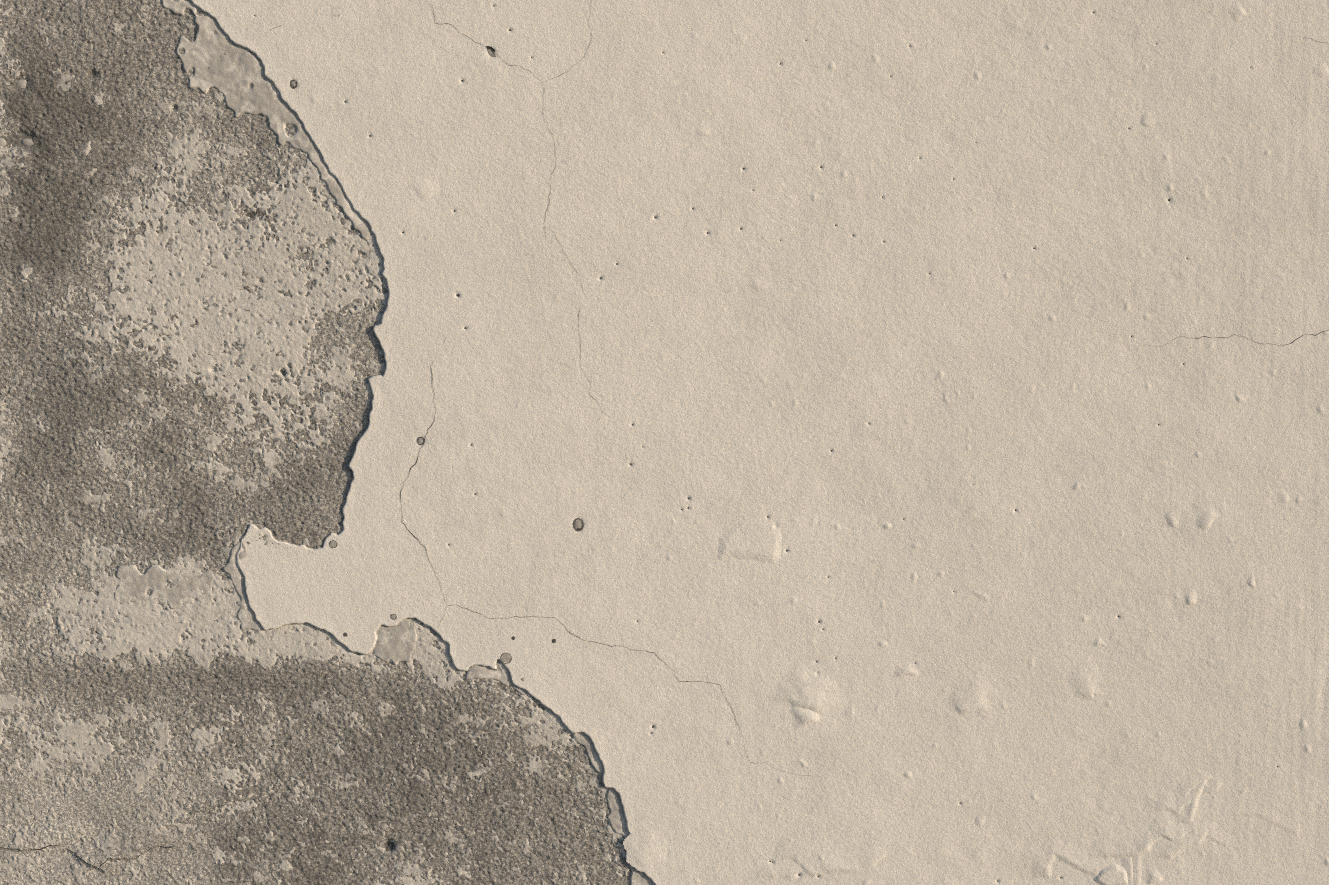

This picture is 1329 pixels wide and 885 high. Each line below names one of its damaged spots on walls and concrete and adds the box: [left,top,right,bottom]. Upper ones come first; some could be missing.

crack [0,844,174,870]
peeling [0,0,655,885]